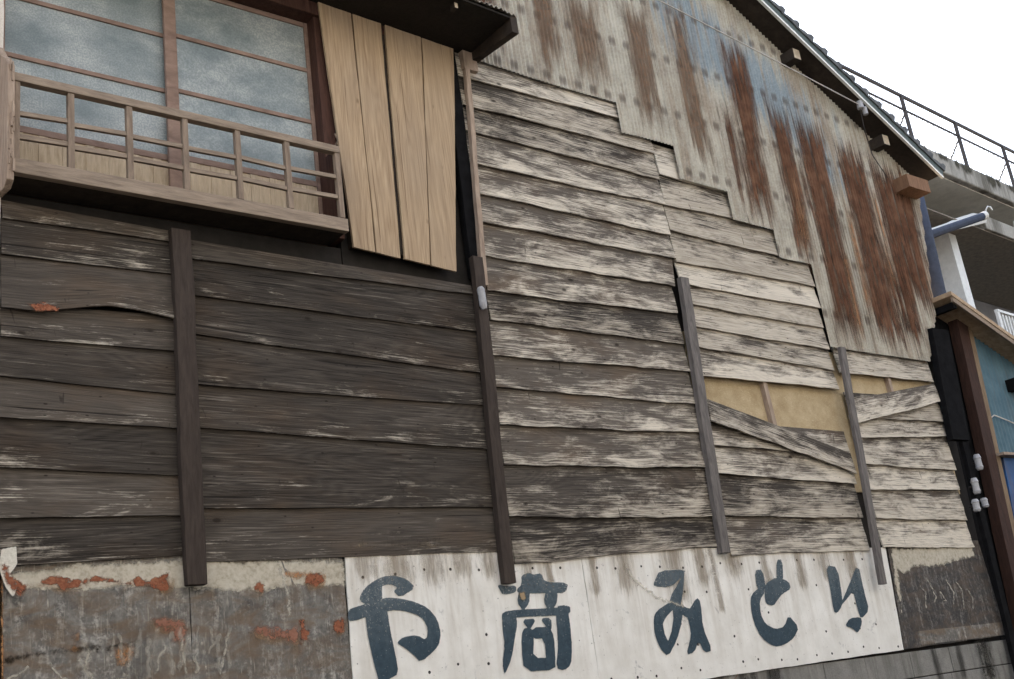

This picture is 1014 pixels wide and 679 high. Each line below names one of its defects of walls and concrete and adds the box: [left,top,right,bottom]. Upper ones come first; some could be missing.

corrosion [533,0,560,67]
corrosion [570,0,607,73]
corrosion [623,6,662,115]
corrosion [672,10,706,159]
corrosion [720,41,933,347]
corrosion [31,302,59,311]
corrosion [41,574,171,593]
corrosion [285,572,325,587]
water stain [4,640,139,664]